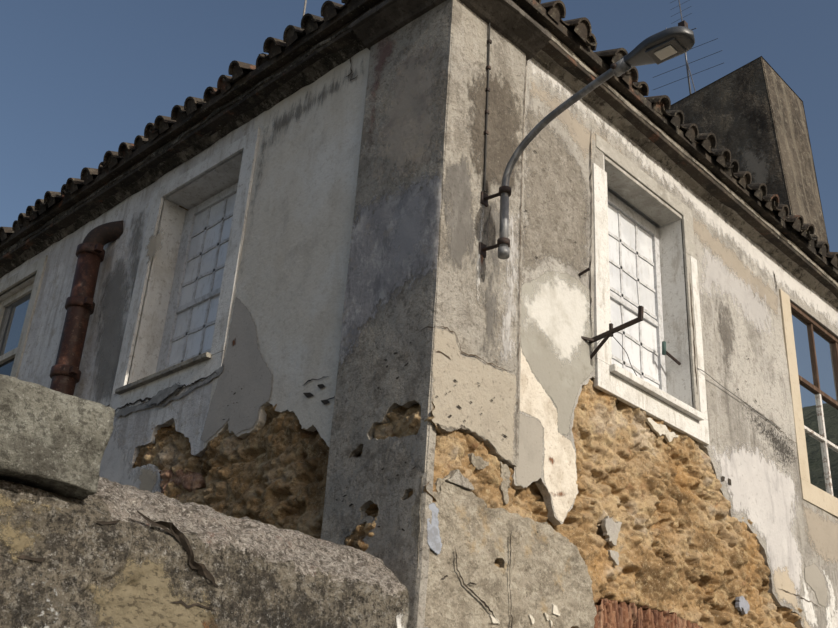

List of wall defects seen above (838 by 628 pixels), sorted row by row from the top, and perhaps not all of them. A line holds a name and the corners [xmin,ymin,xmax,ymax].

spalling [99,297,330,539]
spalling [345,504,380,552]
crack [422,55,527,456]
water stain [443,71,522,358]
crack [455,532,513,628]
water stain [522,274,591,362]
spalling [374,328,838,628]